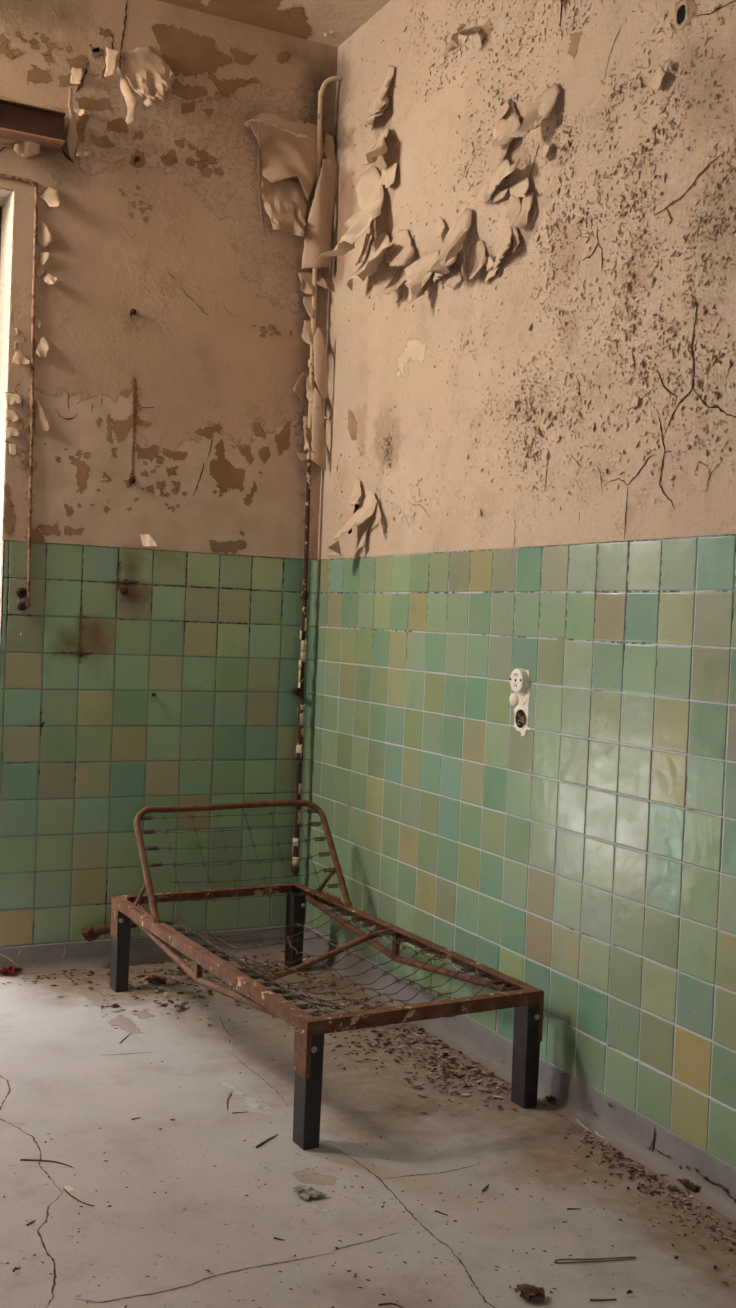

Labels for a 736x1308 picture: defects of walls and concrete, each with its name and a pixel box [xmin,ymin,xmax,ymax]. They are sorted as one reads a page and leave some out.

peeling [158,0,313,40]
peeling [444,18,494,53]
flaking render [568,31,582,59]
peeling [0,24,259,161]
crack [654,152,725,224]
crack [582,228,603,270]
peeling [0,64,560,559]
crack [528,301,736,535]
crack [220,1019,288,1106]
crack [0,1075,496,1308]